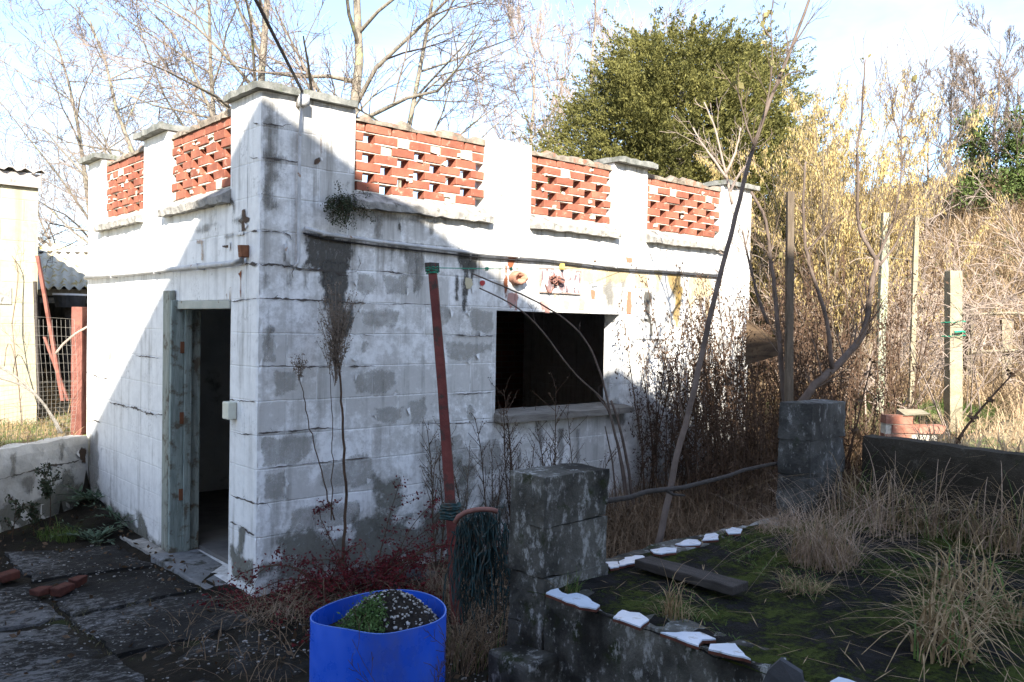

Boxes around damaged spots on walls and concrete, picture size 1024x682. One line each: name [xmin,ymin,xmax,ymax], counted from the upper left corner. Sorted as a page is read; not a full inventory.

damp [302,233,354,337]
crack [88,373,162,423]
damp [0,433,161,547]
damp [230,460,508,585]